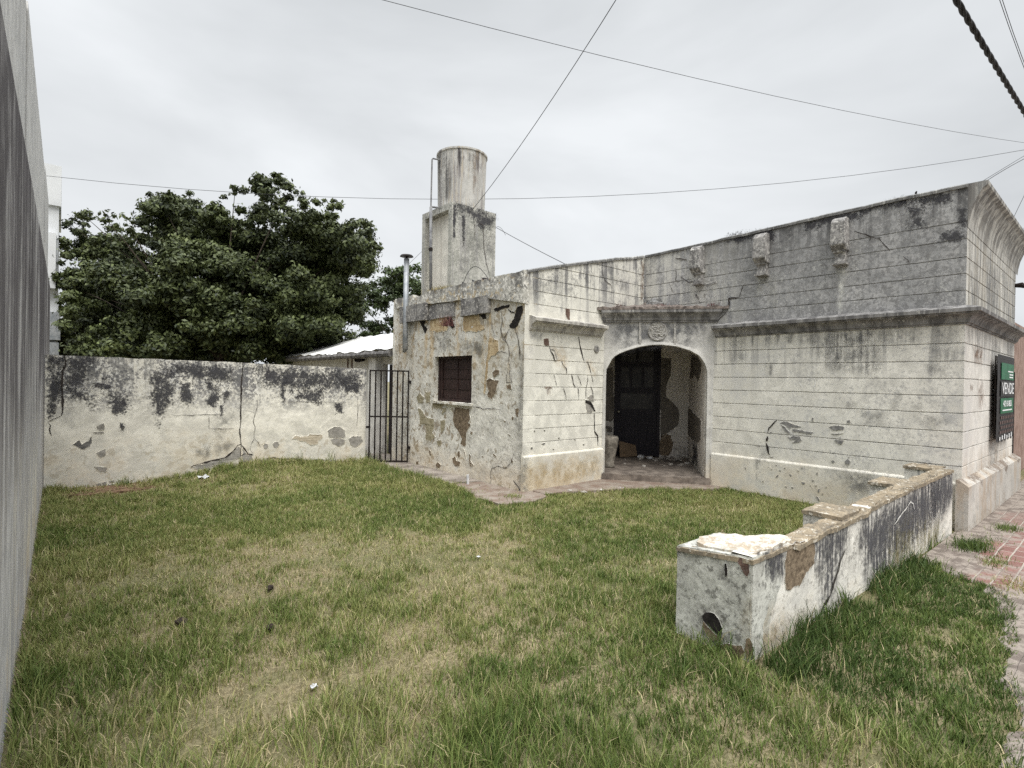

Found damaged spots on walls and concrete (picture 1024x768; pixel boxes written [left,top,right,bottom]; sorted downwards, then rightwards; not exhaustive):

water stain [804,192,968,244]
water stain [47,355,132,431]
water stain [149,360,234,429]
crack [175,363,322,467]
water stain [253,363,365,414]
peeling [292,426,363,447]
spalling [416,391,496,468]
spalling [420,305,524,400]
crack [549,340,598,440]
peeling [659,354,705,456]
water stain [860,469,953,575]
spalling [784,539,816,591]